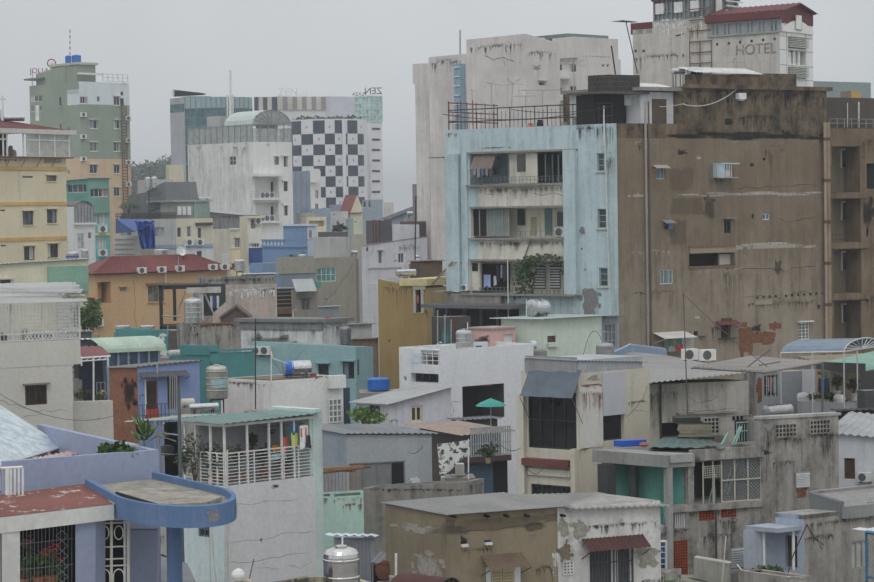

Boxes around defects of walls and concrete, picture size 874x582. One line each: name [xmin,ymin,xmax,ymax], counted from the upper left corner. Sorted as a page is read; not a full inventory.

water stain [668,115,823,143]
flaking render [578,288,602,315]
flaking render [738,321,781,357]
peeling [552,518,590,576]
peeling [634,547,663,568]